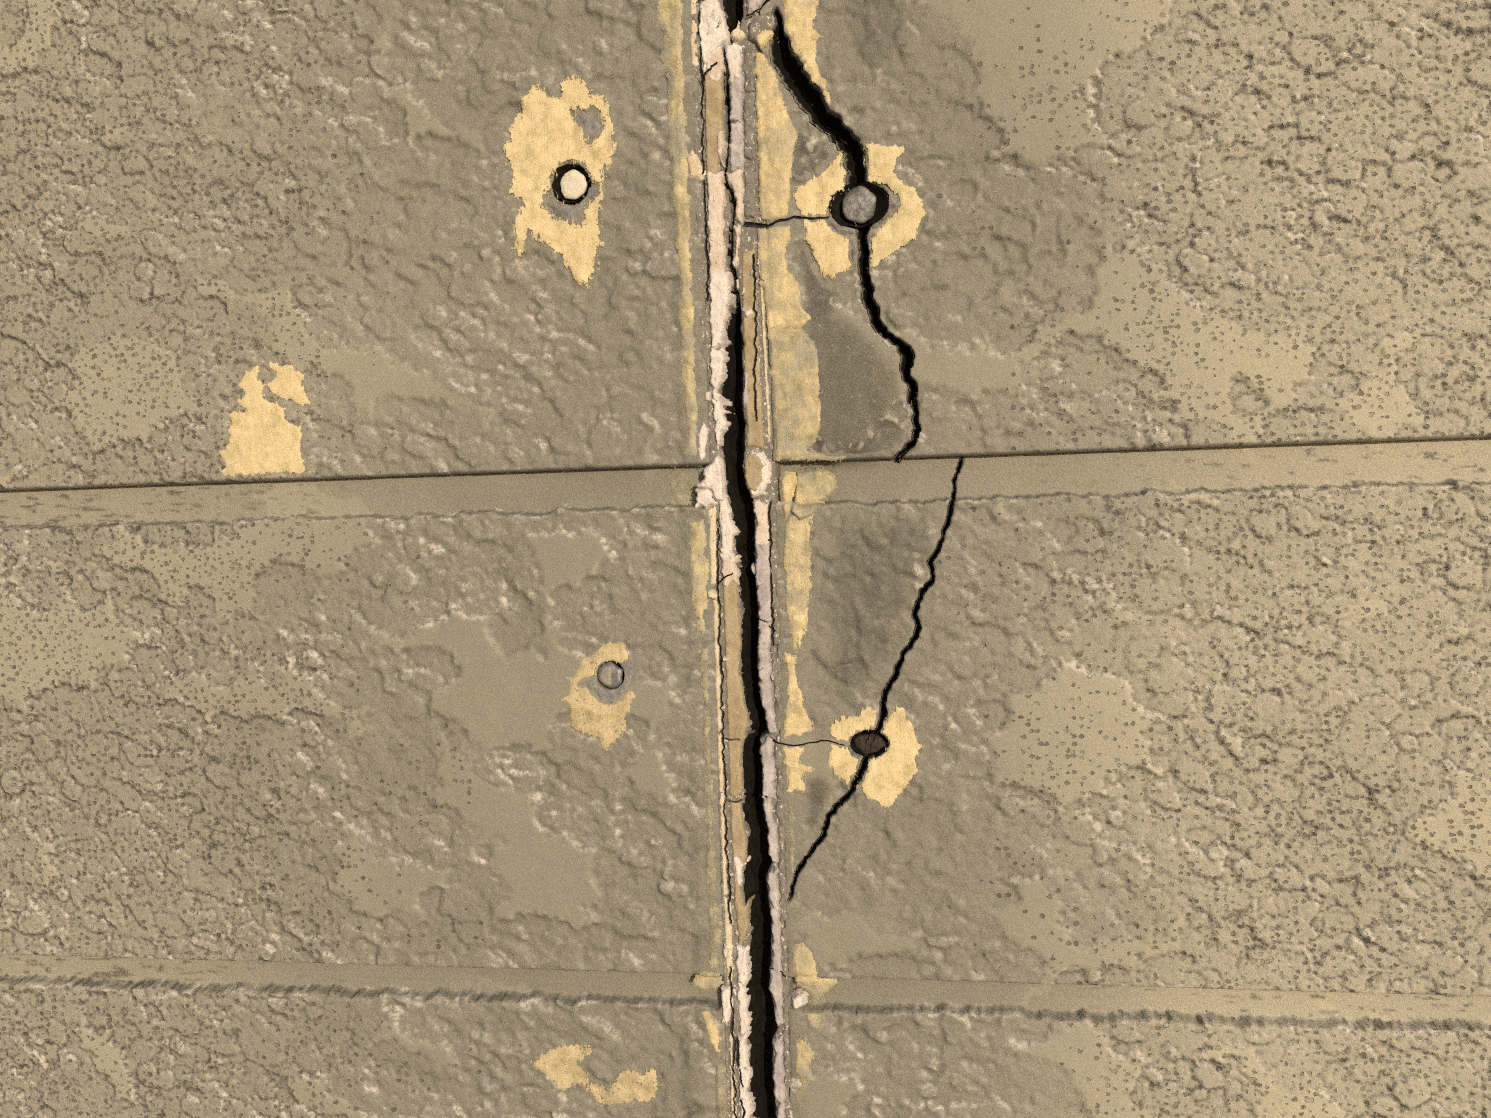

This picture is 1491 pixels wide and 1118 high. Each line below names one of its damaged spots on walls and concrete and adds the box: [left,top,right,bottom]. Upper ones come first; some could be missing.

spalling [549,187,597,220]
water stain [794,134,828,179]
spalling [829,189,898,261]
water stain [795,250,897,462]
peeling [694,0,809,1118]
crack [694,0,963,1118]